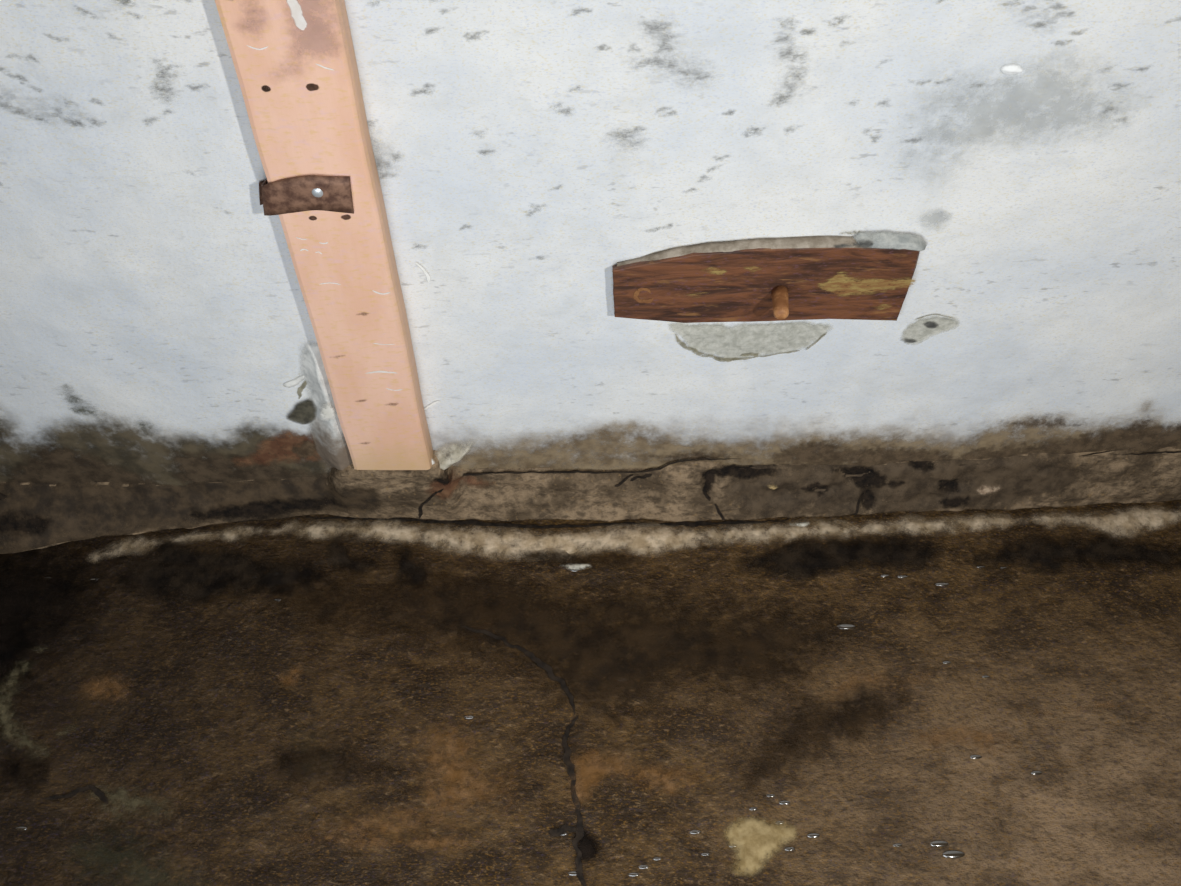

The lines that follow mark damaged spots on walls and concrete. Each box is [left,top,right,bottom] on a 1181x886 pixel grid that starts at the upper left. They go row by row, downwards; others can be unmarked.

spalling [670,322,829,362]
spalling [903,314,958,344]
spalling [287,381,316,425]
crack [306,458,786,529]
water stain [456,419,1181,518]
water stain [0,398,831,749]
water stain [742,538,939,579]
water stain [973,537,1181,573]
crack [459,626,597,886]
water stain [747,695,886,787]